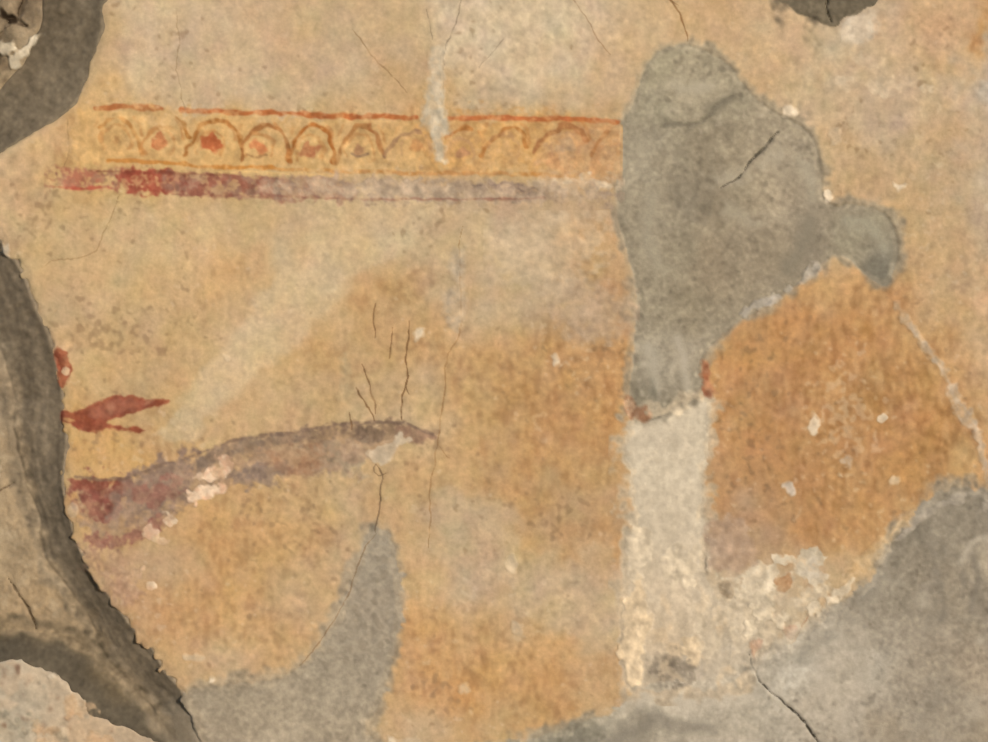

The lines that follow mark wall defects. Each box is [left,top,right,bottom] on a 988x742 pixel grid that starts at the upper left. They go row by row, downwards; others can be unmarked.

crack [669,0,689,42]
peeling [781,103,801,120]
crack [720,131,779,189]
peeling [822,188,834,205]
crack [348,303,410,430]
crack [428,332,461,552]
peeling [779,477,797,498]
peeling [614,522,858,689]
crack [762,684,819,742]